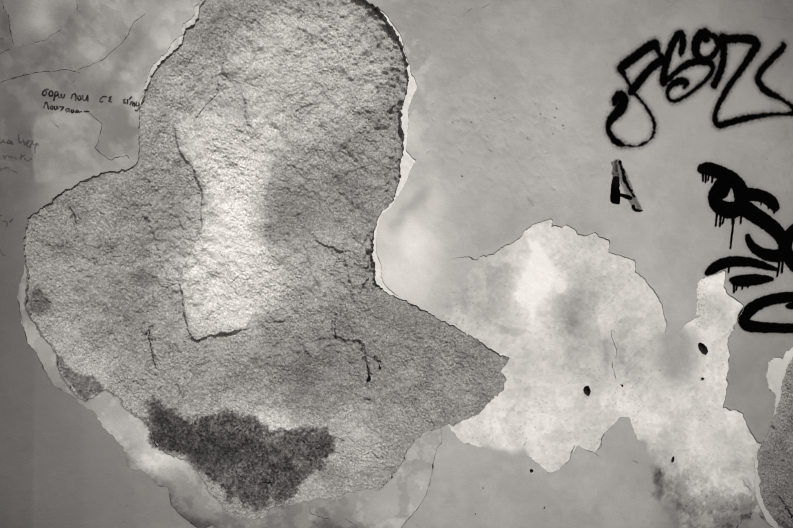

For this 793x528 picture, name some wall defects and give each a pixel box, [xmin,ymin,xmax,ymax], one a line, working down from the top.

peeling [2,0,77,46]
leakage [147,399,335,510]
spalling [17,0,509,528]
peeling [422,218,793,528]